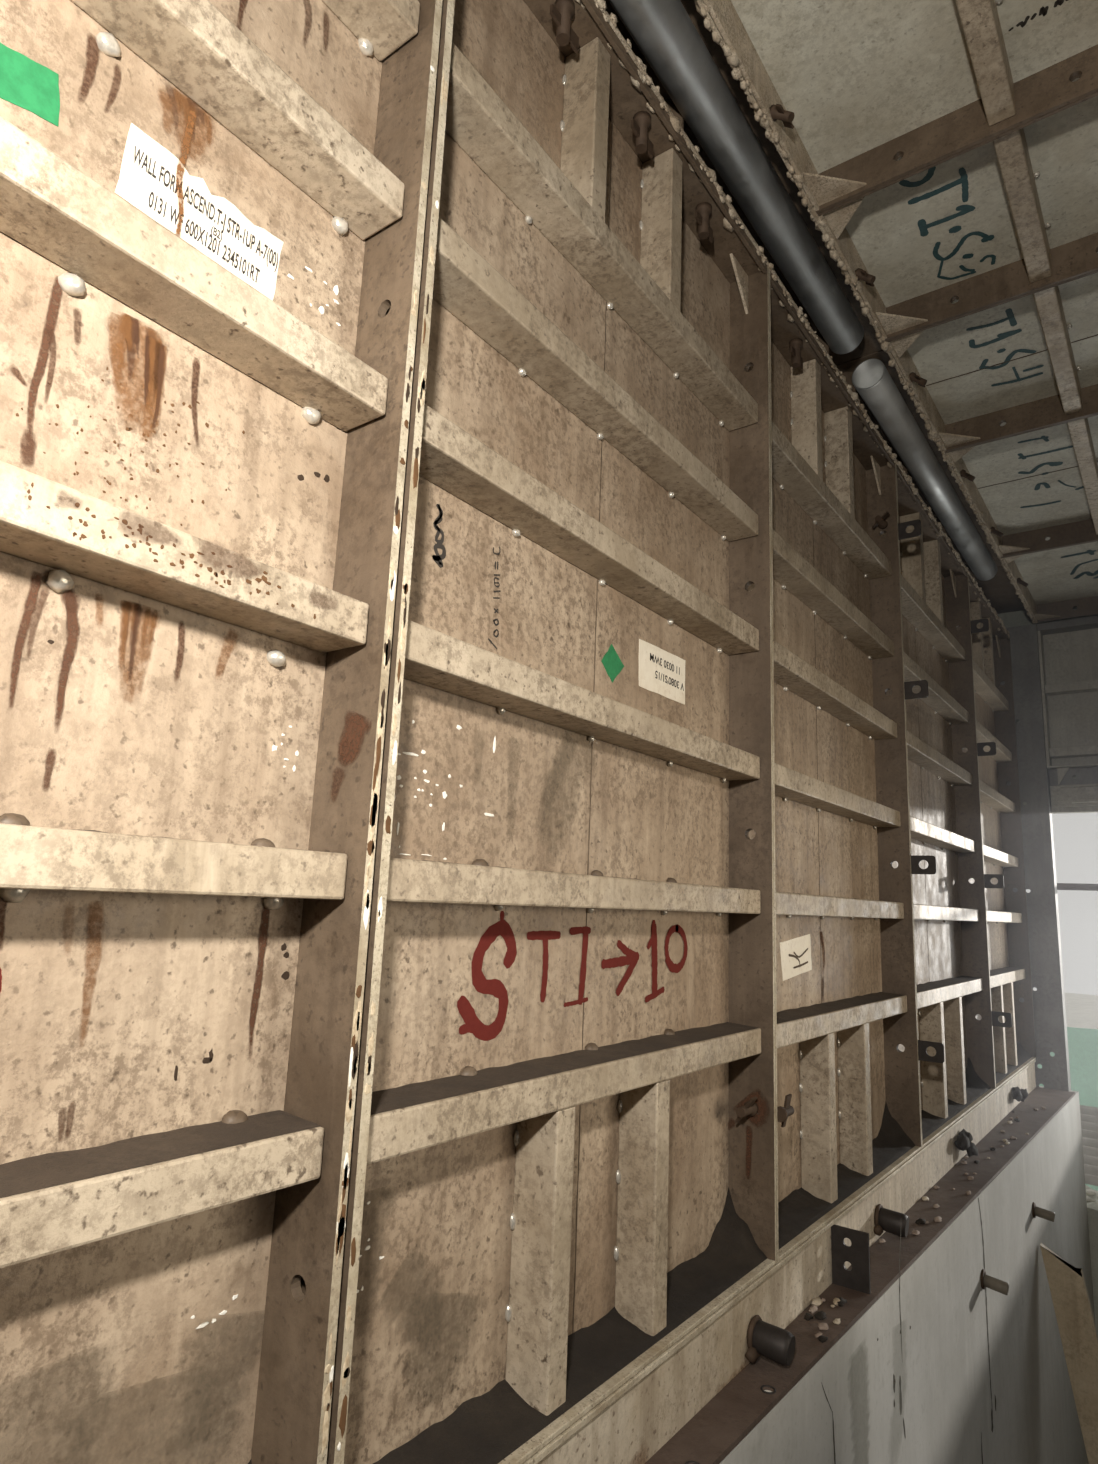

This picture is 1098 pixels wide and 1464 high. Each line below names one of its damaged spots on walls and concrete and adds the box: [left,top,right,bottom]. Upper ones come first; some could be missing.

corrosion [79,35,121,111]
corrosion [237,0,247,30]
corrosion [160,90,211,237]
corrosion [12,277,81,464]
corrosion [109,315,166,436]
corrosion [10,573,80,726]
corrosion [119,602,157,695]
corrosion [44,750,55,789]
corrosion [332,713,371,799]
corrosion [82,903,102,1037]
corrosion [249,907,270,1053]
crack [821,1382,836,1464]